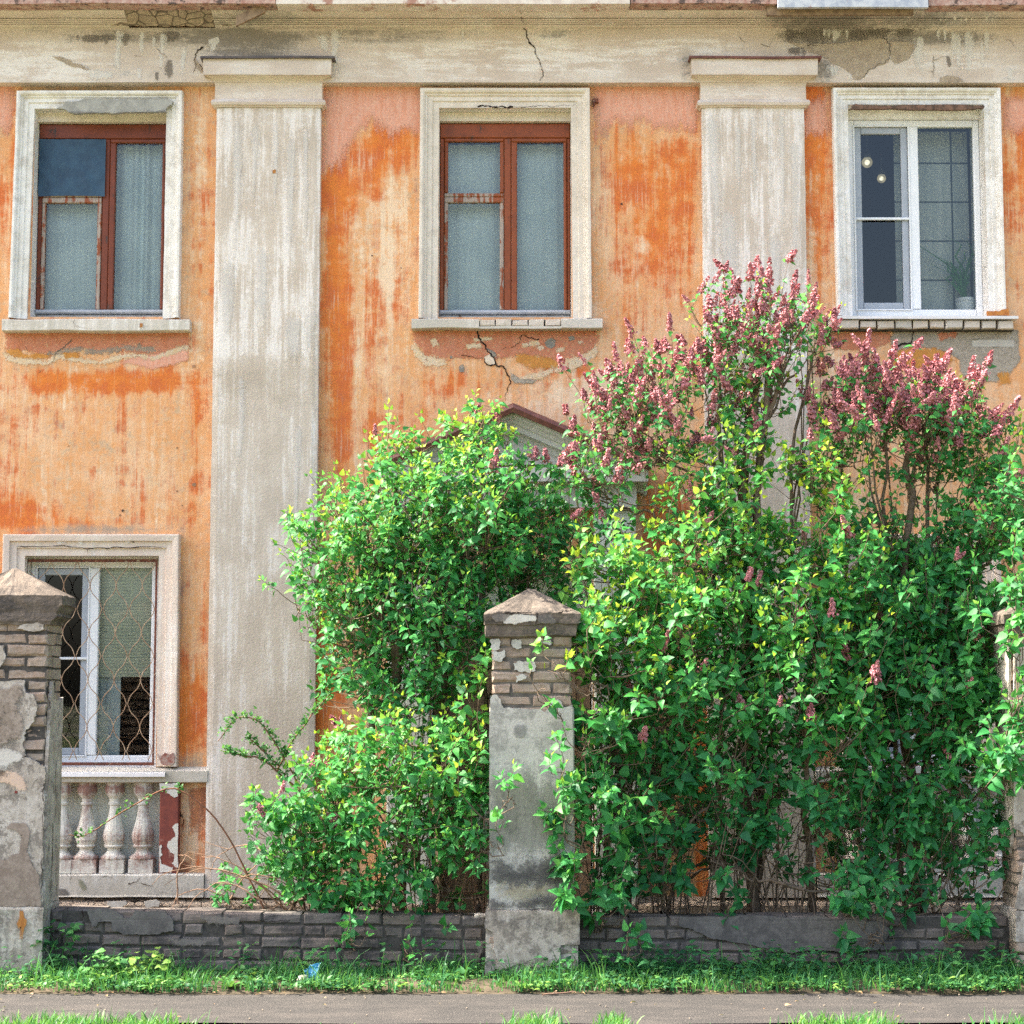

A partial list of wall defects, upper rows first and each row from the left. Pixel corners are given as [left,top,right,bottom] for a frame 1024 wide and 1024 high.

spalling [111,10,232,51]
peeling [788,38,915,80]
peeling [2,333,191,370]
crack [462,331,539,402]
peeling [408,330,599,380]
spalling [831,330,1020,386]
peeling [503,614,536,624]
peeling [0,683,26,791]
peeling [159,783,178,798]
peeling [0,823,41,907]
peeling [159,823,178,873]